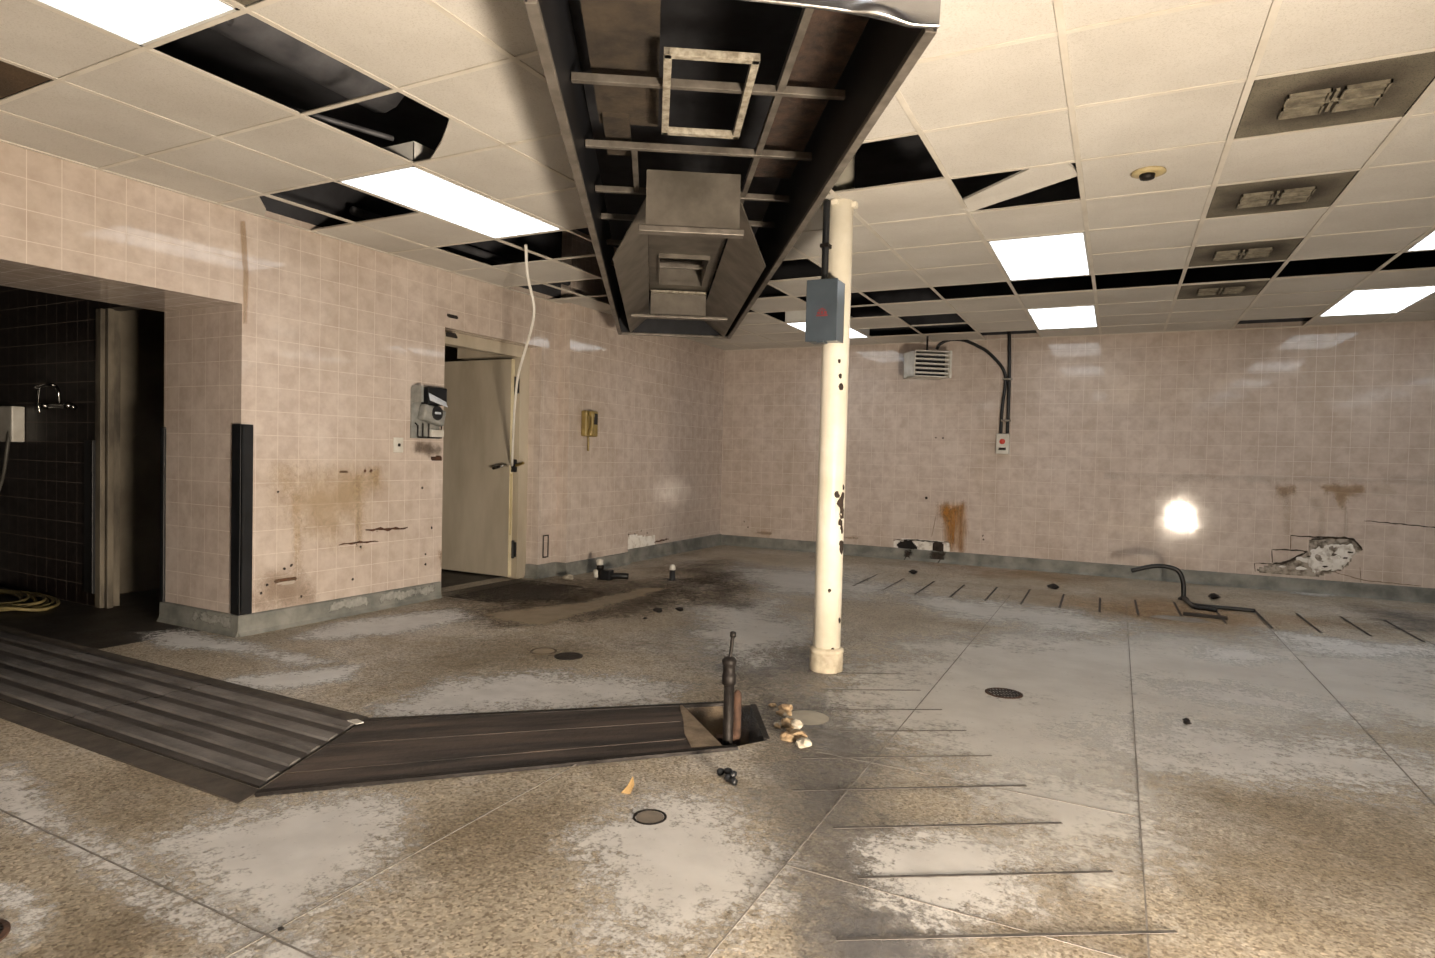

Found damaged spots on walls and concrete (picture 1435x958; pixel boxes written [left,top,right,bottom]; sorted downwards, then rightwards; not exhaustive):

spalling [834,484,845,555]
rust [943,504,965,548]
spalling [1254,535,1363,582]
leakage [139,560,1435,958]
leakage [0,764,417,958]